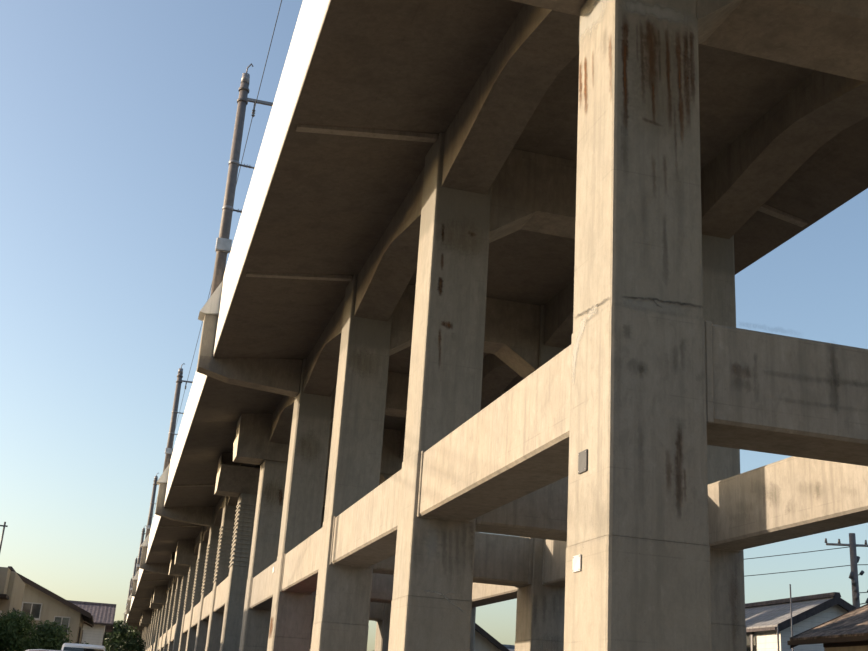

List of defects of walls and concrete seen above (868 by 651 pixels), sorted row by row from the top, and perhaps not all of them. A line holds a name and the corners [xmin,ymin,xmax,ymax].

rust [579,60,587,103]
rust [647,23,694,130]